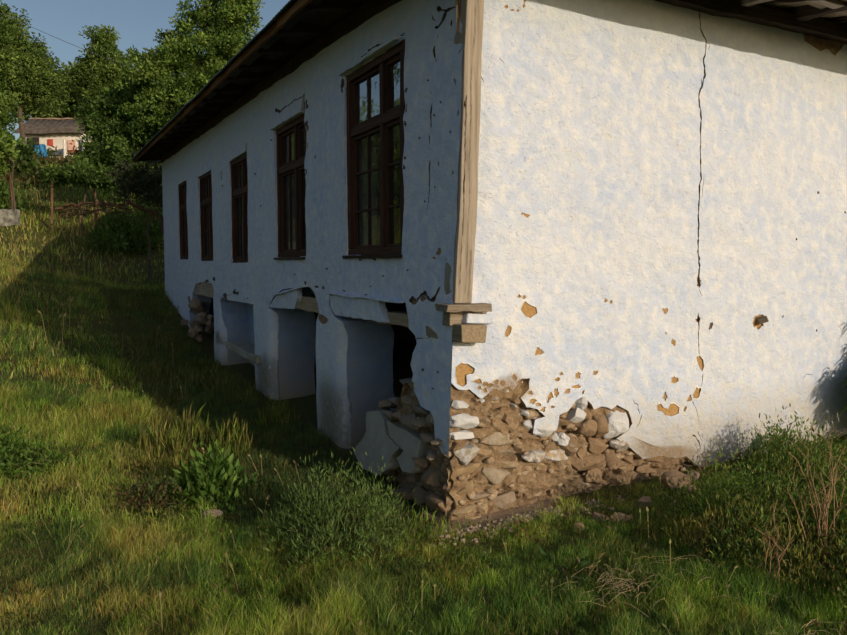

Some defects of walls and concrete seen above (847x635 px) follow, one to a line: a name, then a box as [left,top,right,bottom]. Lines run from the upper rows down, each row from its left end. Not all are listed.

crack [432,6,465,58]
spalling [803,34,845,55]
crack [426,105,439,213]
crack [697,12,710,347]
crack [409,287,440,302]
peeling [516,294,537,318]
spalling [353,362,702,524]